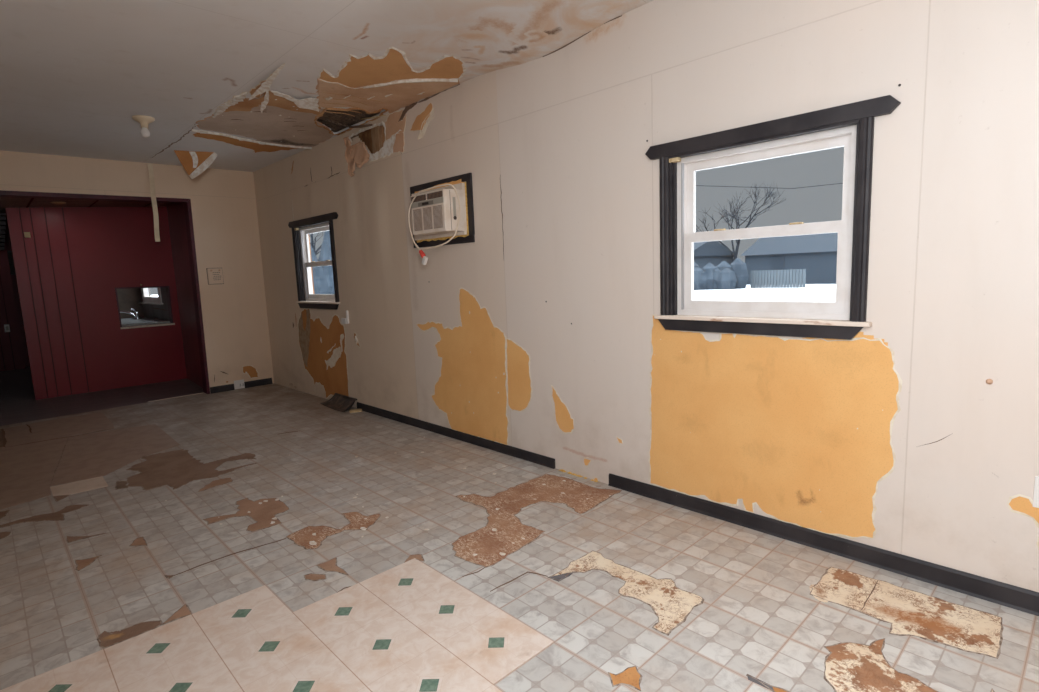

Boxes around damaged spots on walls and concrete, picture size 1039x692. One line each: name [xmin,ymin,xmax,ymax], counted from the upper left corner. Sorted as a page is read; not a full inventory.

peeling [316,47,466,144]
peeling [297,308,360,398]
peeling [416,287,533,445]
peeling [115,449,256,492]
peeling [203,498,289,532]
peeling [286,512,381,550]
peeling [451,474,622,568]
peeling [648,314,902,539]
peeling [1007,494,1039,550]
peeling [547,551,704,636]
peeling [809,567,1004,692]
peeling [746,674,790,692]